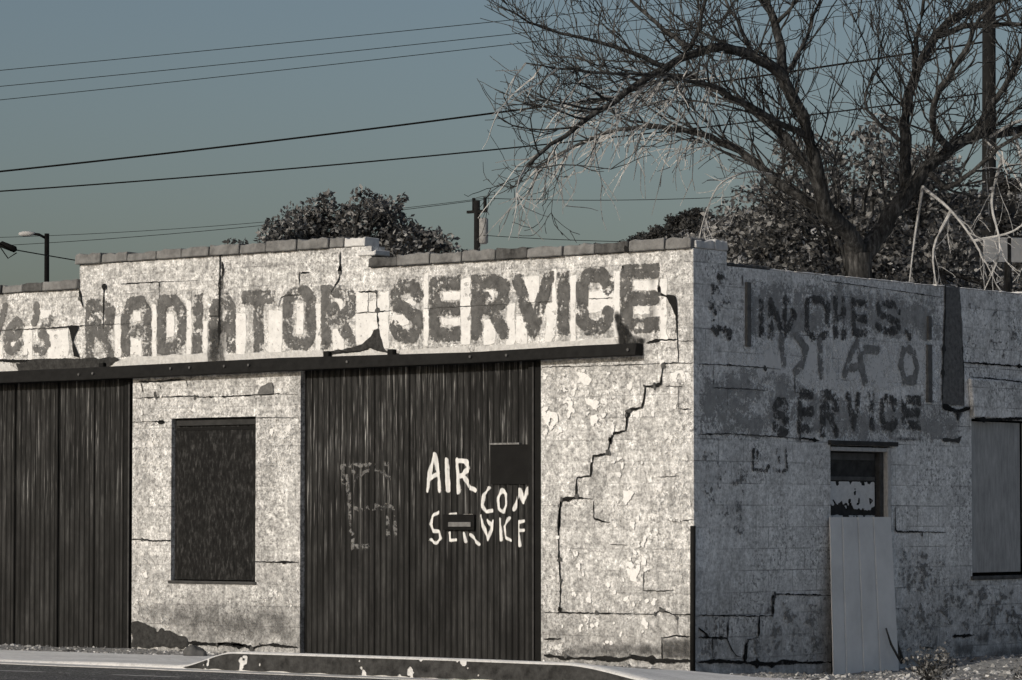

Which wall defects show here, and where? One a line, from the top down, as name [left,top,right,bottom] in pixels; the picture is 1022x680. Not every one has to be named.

crack [424,301,550,309]
crack [542,282,831,669]
peeling [830,481,875,517]
peeling [753,597,828,661]
peeling [898,542,1022,658]